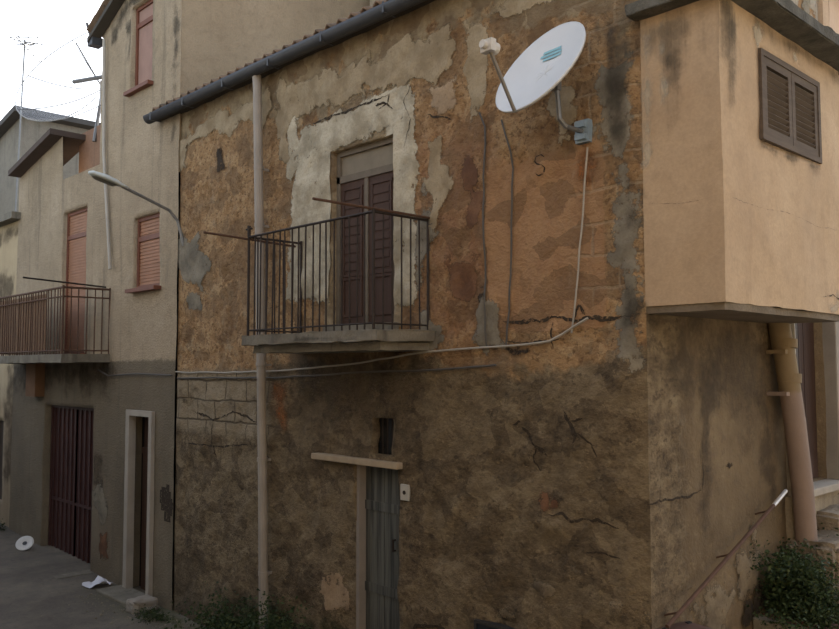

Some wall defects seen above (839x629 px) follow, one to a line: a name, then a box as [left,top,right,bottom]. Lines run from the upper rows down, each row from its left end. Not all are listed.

flaking render [490,0,553,18]
leakage [725,1,735,49]
flaking render [178,15,489,351]
leakage [592,28,646,373]
spalling [444,253,530,355]
crack [188,410,257,460]
crack [645,468,704,506]